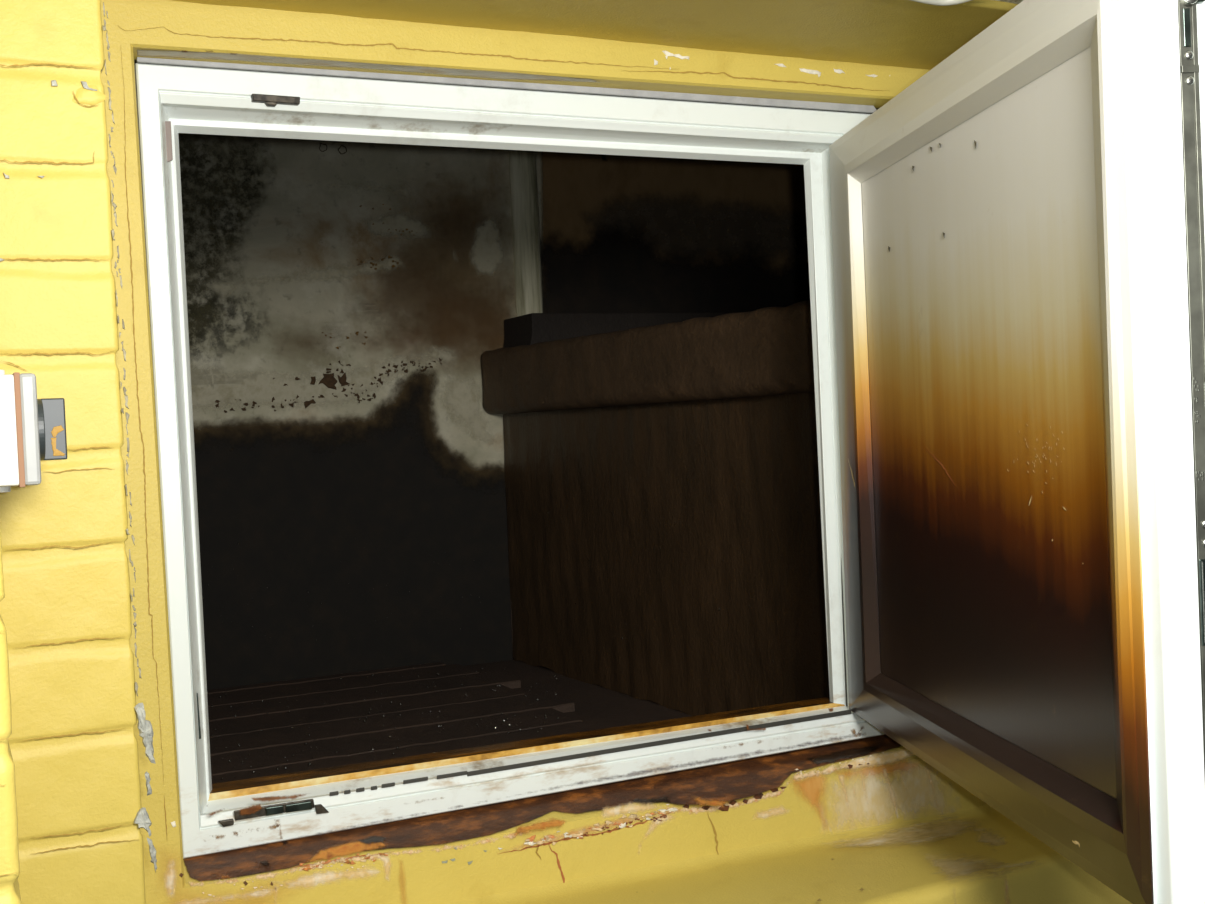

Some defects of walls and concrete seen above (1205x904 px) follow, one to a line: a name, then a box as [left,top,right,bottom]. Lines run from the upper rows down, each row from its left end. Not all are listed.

peeling [654,50,689,69]
peeling [775,64,844,77]
peeling [81,2,157,872]
crack [0,27,889,834]
water stain [167,727,901,904]
peeling [483,807,677,854]
peeling [292,852,390,871]
crack [536,845,565,883]